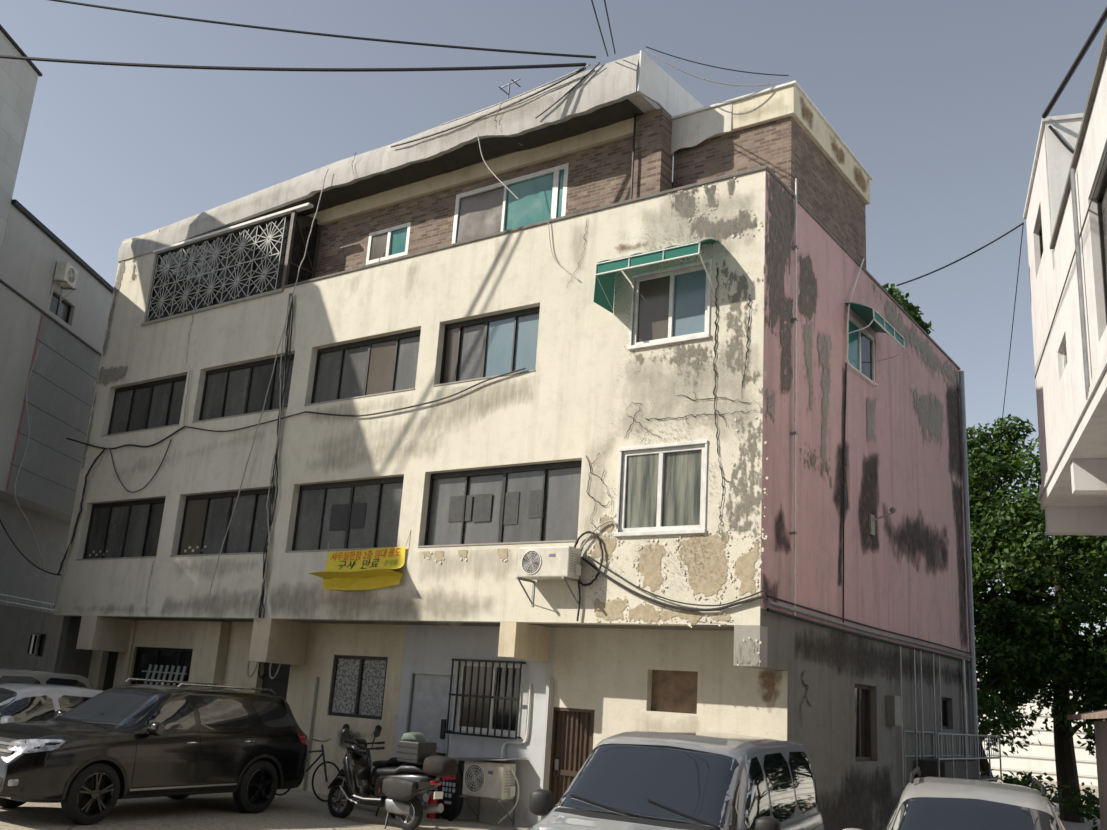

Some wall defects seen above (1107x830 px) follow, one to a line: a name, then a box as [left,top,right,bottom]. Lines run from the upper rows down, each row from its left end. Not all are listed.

peeling [668,166,835,488]
crack [625,267,760,534]
peeling [907,378,945,449]
crack [586,453,612,528]
peeling [587,477,768,628]
damp [796,632,968,691]
damp [819,769,898,830]